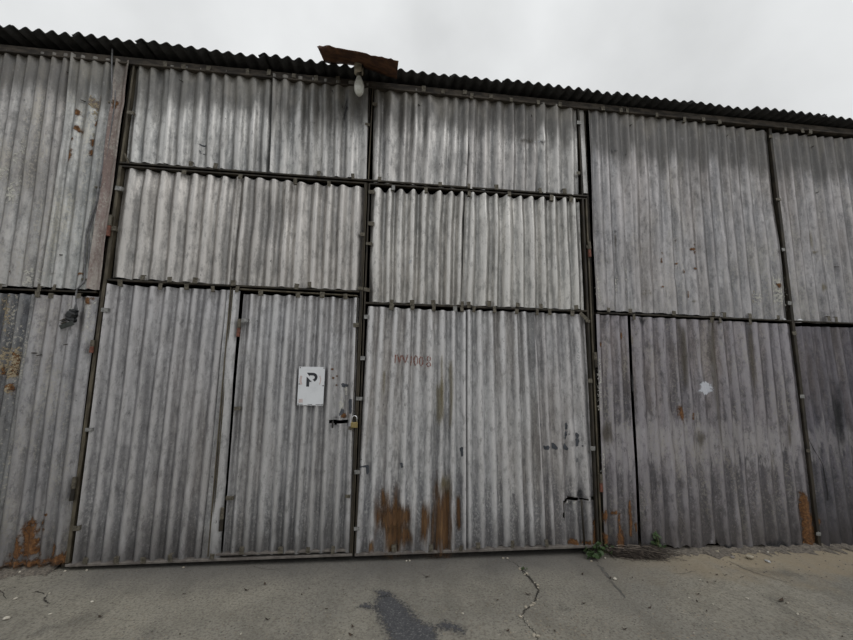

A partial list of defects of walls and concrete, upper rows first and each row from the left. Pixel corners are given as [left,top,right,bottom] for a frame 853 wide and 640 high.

rust [3,513,71,569]
rust [374,481,461,558]
rust [767,492,821,547]
crack [502,557,540,640]